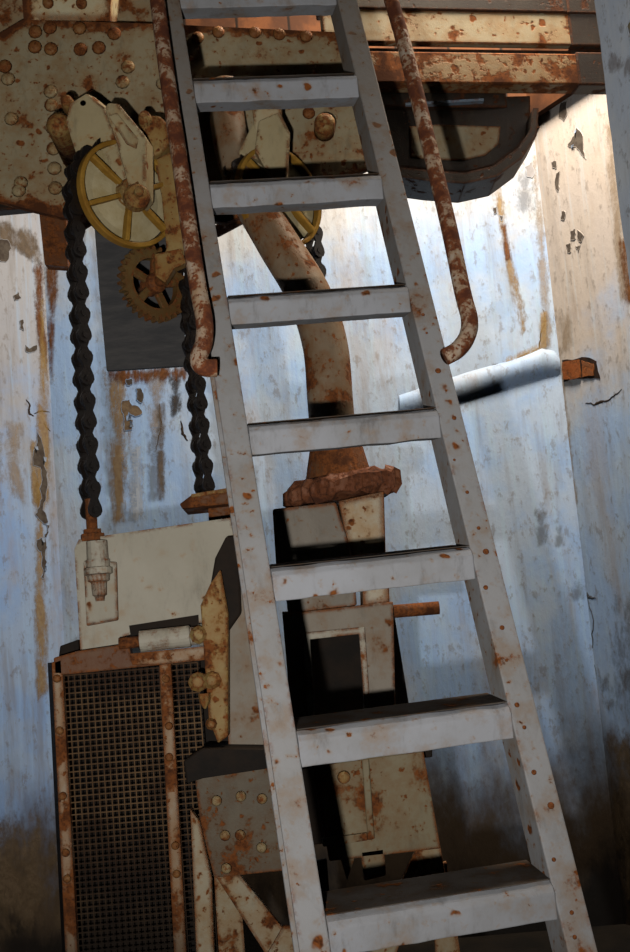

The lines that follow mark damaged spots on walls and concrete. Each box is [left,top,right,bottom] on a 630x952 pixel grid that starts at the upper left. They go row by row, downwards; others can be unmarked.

peeling [551,161,560,192]
peeling [0,239,11,262]
peeling [566,229,584,253]
crack [585,389,622,406]
peeling [32,432,50,579]